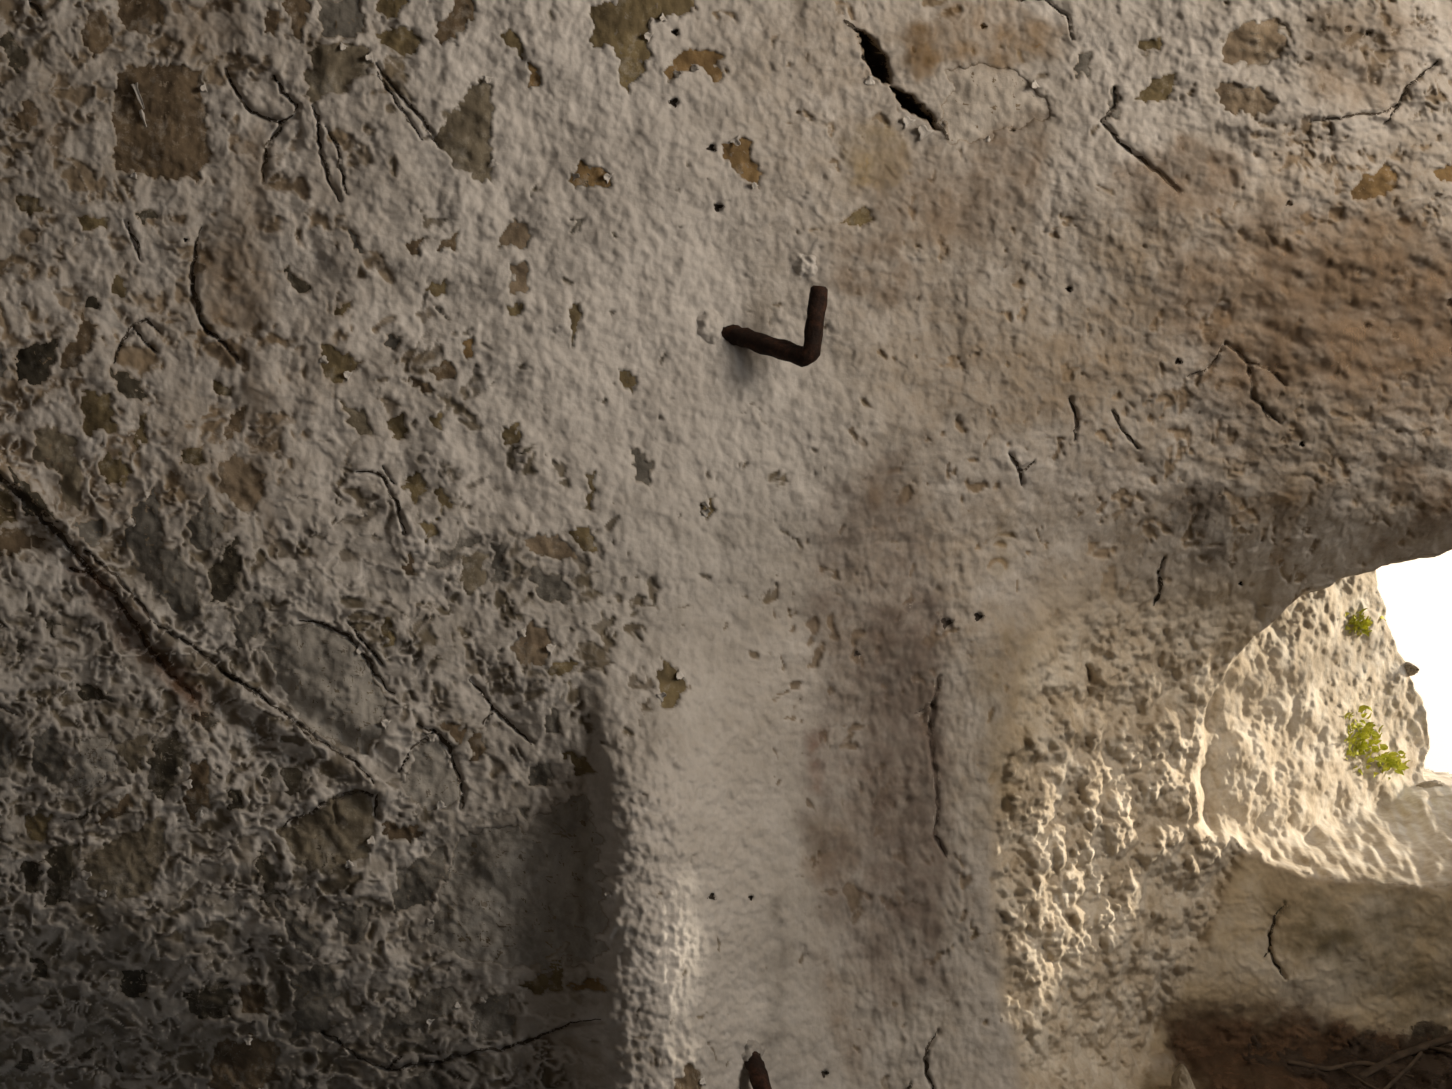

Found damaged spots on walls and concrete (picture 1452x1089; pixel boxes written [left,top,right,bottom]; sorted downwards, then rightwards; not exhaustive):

peeling [112,63,212,183]
peeling [264,0,475,102]
peeling [433,75,498,183]
peeling [589,0,727,93]
crack [844,19,950,142]
peeling [0,275,127,385]
peeling [0,368,265,621]
peeling [401,471,508,595]
peeling [525,471,598,604]
crack [0,465,465,832]
crack [469,680,532,745]
peeling [656,661,686,708]